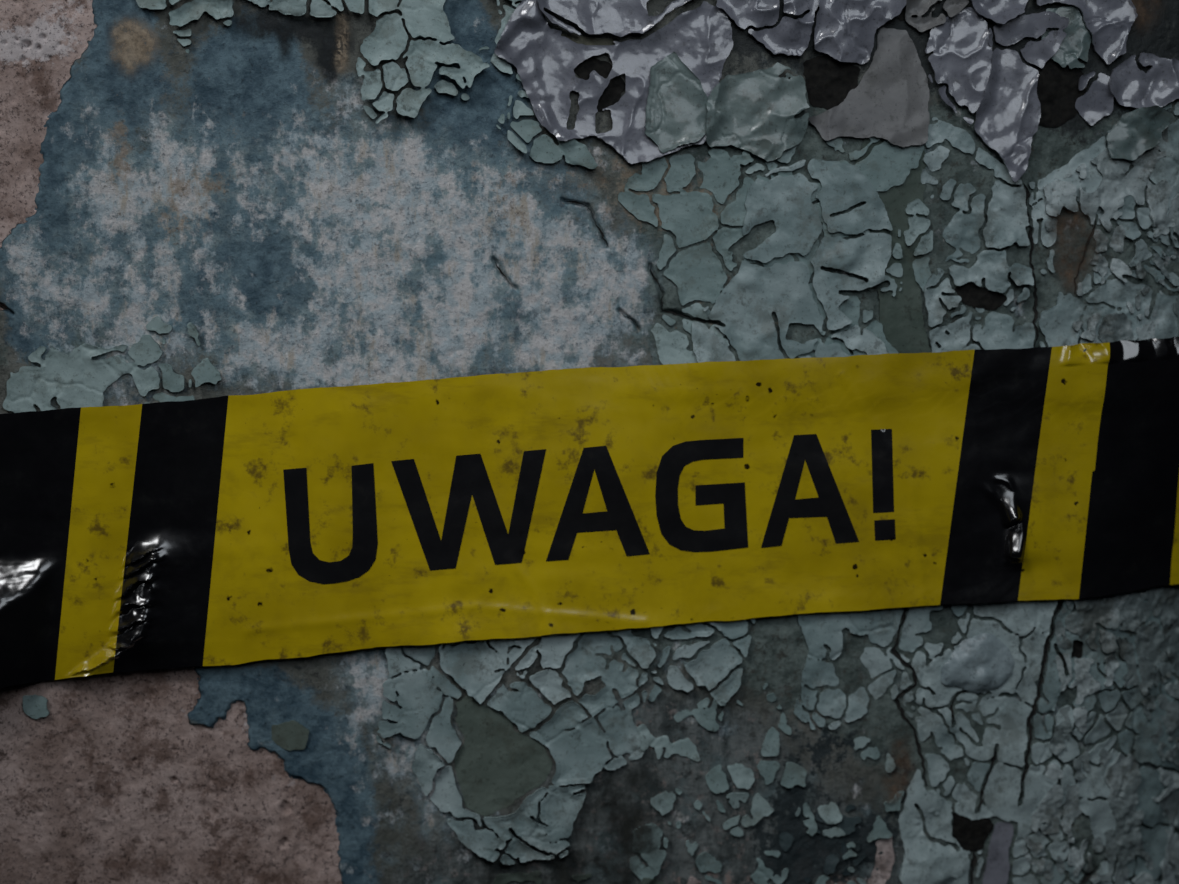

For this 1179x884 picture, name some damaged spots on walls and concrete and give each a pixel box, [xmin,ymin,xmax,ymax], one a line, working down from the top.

spalling [0,0,97,248]
peeling [136,0,234,54]
peeling [248,0,1179,365]
peeling [3,316,222,413]
spalling [0,666,343,884]
peeling [376,618,755,884]
peeling [694,586,1179,884]